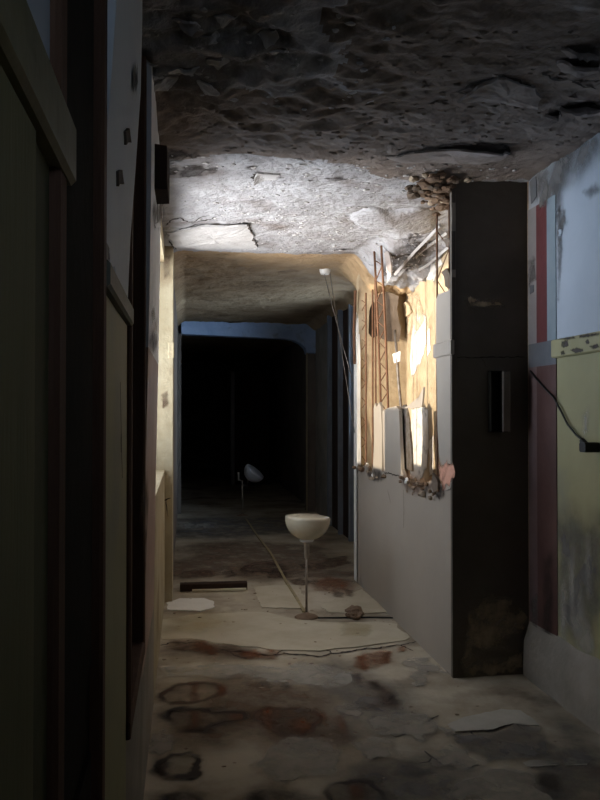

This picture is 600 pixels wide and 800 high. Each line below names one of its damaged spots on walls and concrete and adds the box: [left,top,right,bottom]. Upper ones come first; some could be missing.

spalling [386,149,511,217]
leakage [536,134,599,199]
crack [166,215,258,249]
spalling [384,233,442,281]
peeling [410,314,431,375]
peeling [561,333,599,355]
peeling [403,407,455,499]
leakage [173,641,277,658]
crack [162,641,416,658]
leakage [158,674,340,746]
leakage [154,752,202,779]